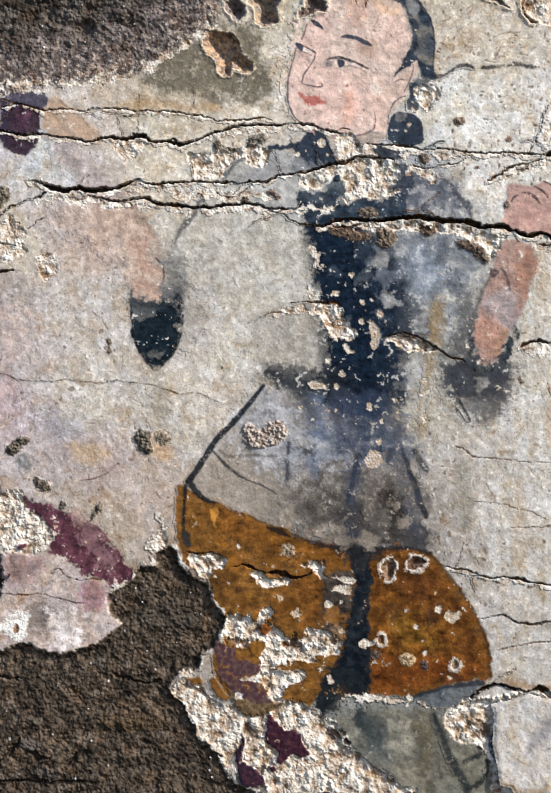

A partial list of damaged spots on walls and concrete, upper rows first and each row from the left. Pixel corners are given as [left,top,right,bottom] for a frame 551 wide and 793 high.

flaking render [0,0,330,99]
crack [0,87,551,274]
crack [518,338,551,351]
flaking render [0,488,56,556]
spalling [377,551,430,585]
crack [444,541,551,592]
flaking render [0,512,419,793]
peeling [433,591,462,624]
spalling [440,656,463,681]
crack [468,667,549,708]
crack [481,613,551,651]
peeling [341,688,551,793]